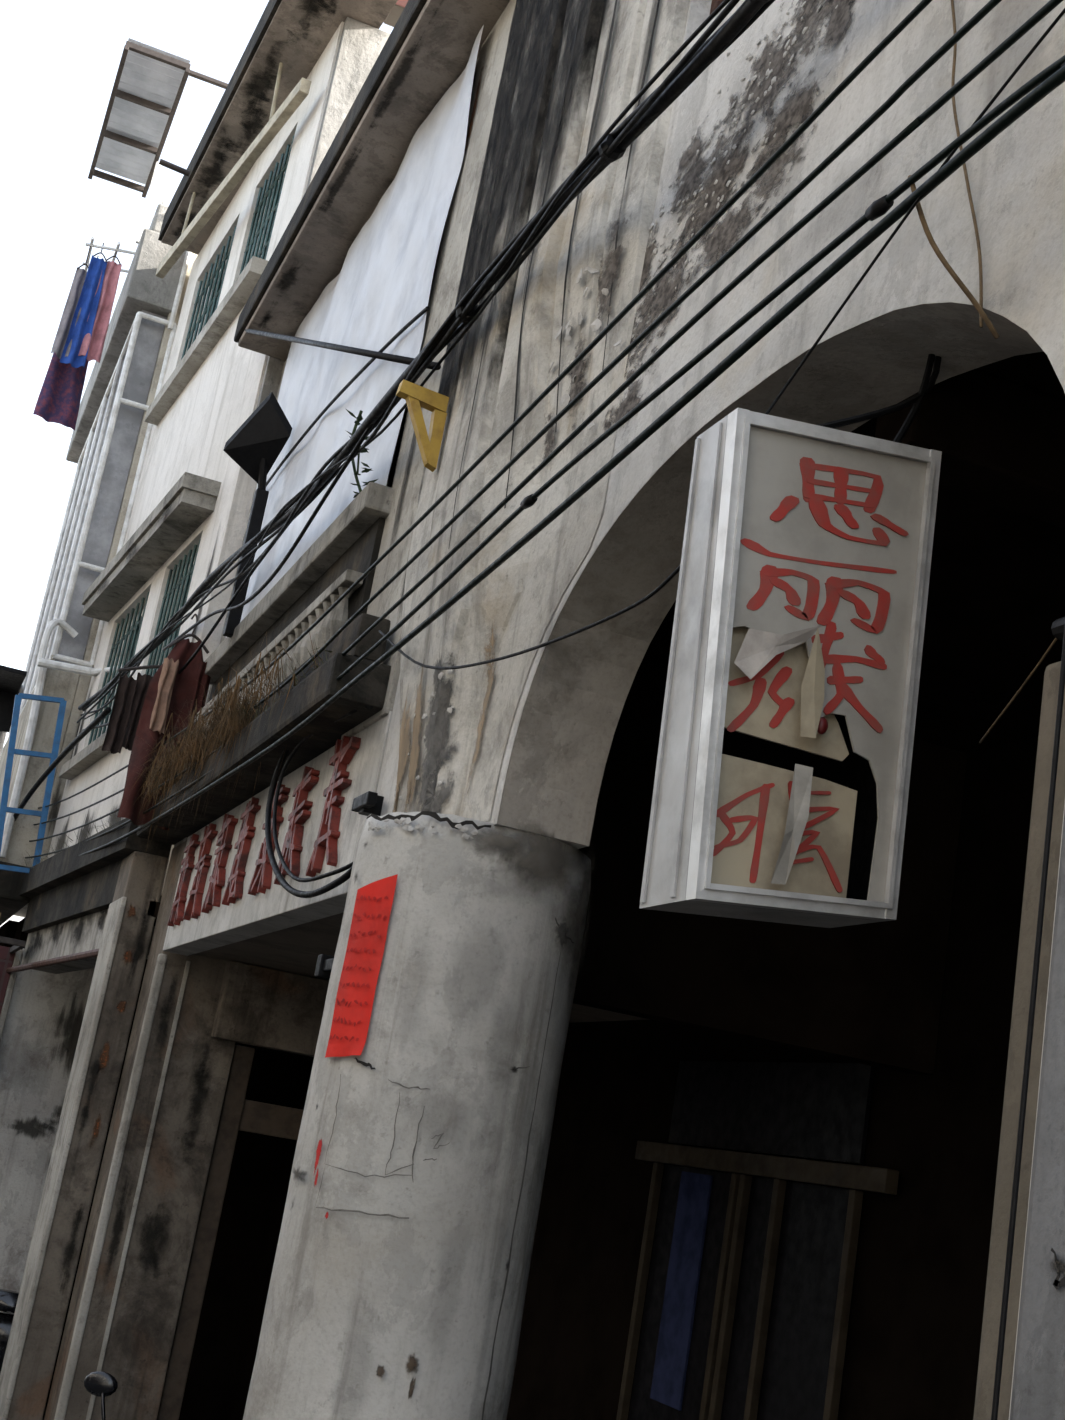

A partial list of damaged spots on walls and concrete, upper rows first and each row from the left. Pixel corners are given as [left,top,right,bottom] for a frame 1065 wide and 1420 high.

leakage [300,0,336,35]
leakage [370,45,417,128]
leakage [634,0,658,110]
leakage [173,42,284,239]
leakage [320,148,361,211]
leakage [423,0,616,413]
leakage [393,432,422,532]
leakage [131,913,149,974]
leakage [57,995,84,1070]
leakage [12,1106,63,1138]
leakage [79,1060,100,1131]
leakage [61,1208,83,1289]